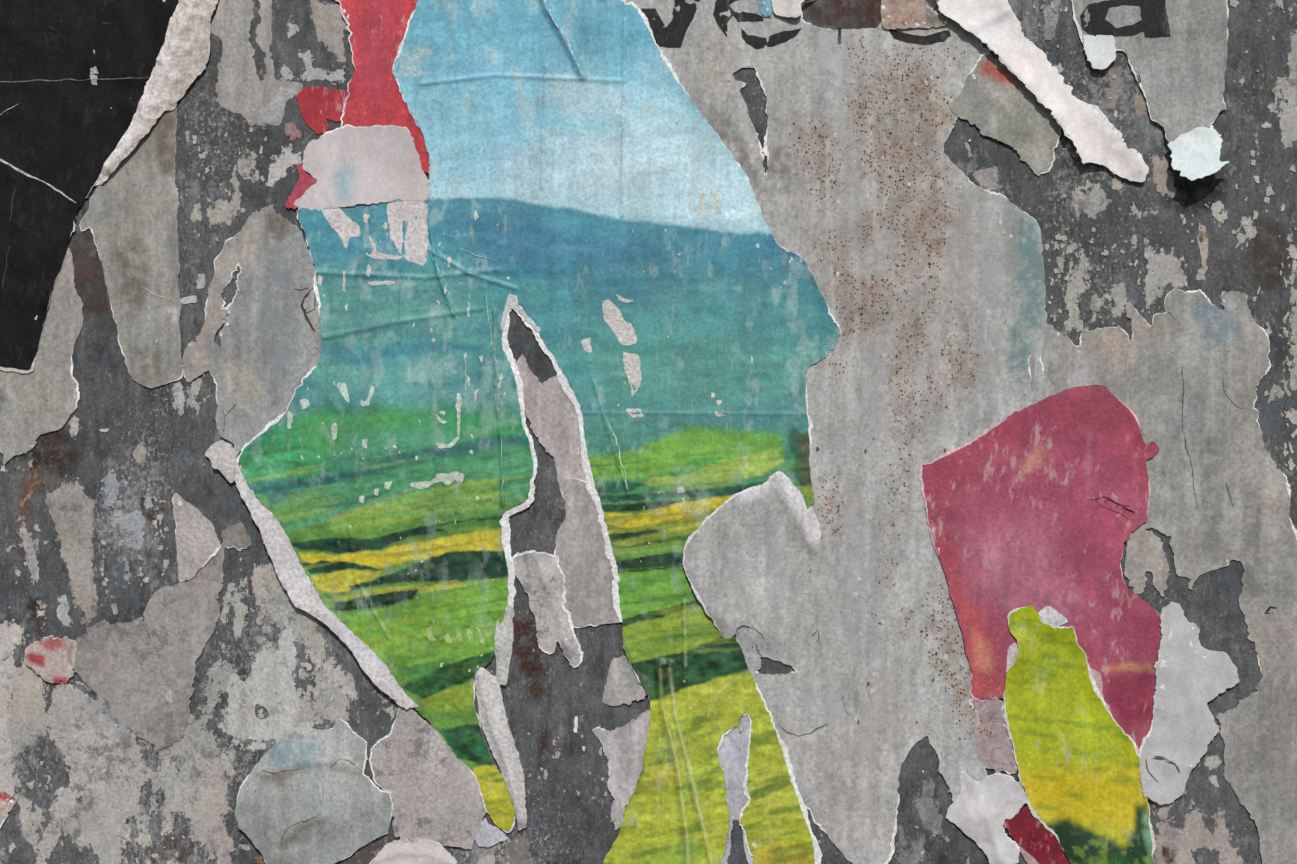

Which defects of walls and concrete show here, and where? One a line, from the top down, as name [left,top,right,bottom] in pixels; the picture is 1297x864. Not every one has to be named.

peeling [177,0,361,248]
peeling [1045,0,1297,335]
peeling [170,373,210,416]
peeling [321,200,452,285]
peeling [602,295,645,418]
rust [789,0,979,597]
peeling [1264,227,1297,471]
peeling [410,471,465,489]
peeling [1124,529,1170,597]
peeling [0,443,398,864]
peeling [895,766,970,864]
peeling [1148,755,1244,864]